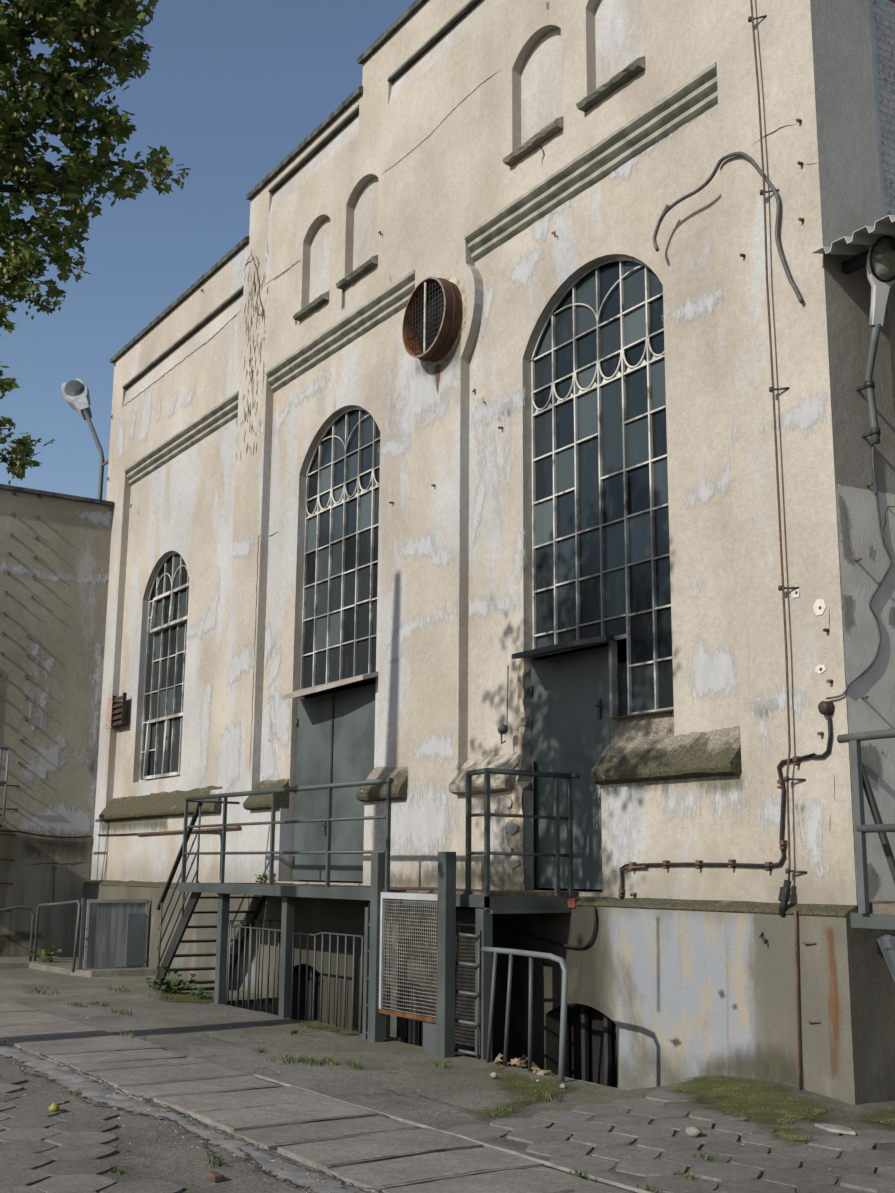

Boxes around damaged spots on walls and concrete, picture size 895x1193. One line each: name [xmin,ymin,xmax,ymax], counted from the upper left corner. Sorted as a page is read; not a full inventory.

crack [386,70,500,171]
flaking render [872,0,895,215]
peeling [72,510,113,530]
peeling [837,486,852,562]
peeling [0,558,109,585]
peeling [842,592,853,629]
peeling [687,627,739,701]
peeling [21,636,112,834]
peeling [753,684,808,753]
peeling [861,743,884,790]
rust [828,929,838,1073]